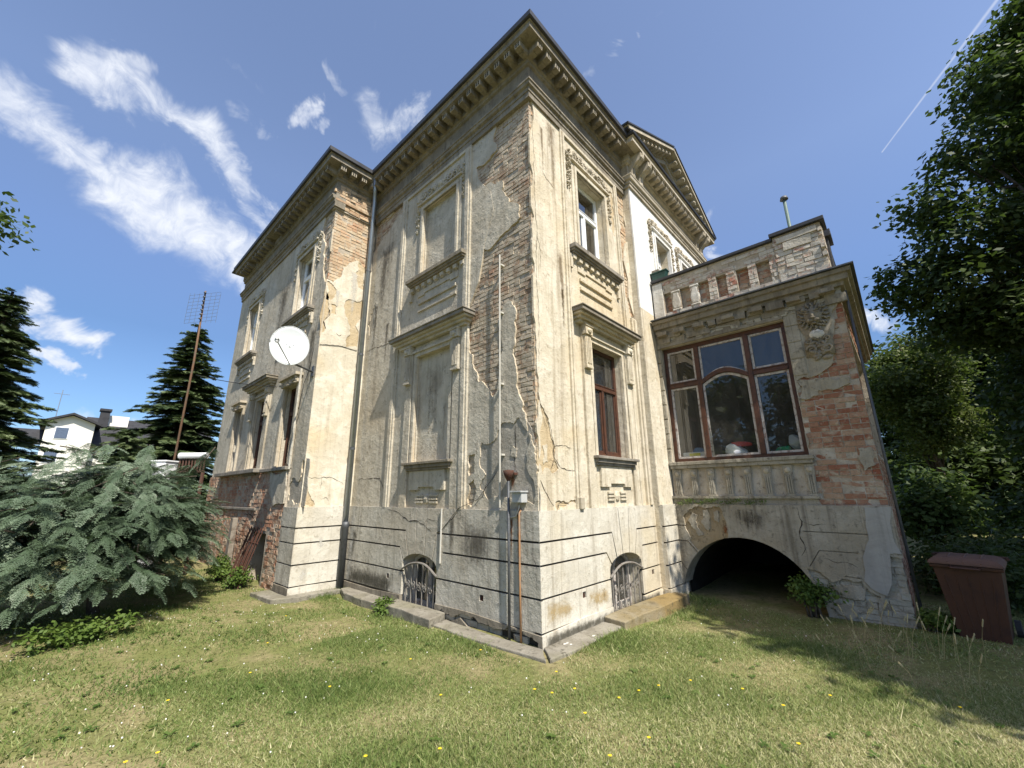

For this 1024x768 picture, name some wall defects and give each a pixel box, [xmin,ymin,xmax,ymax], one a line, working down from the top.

flaking render [319,185,403,347]
flaking render [469,101,558,511]
flaking render [798,287,889,506]
crack [539,397,571,509]
leakage [349,571,390,590]
flaking render [683,503,728,553]
flaking render [809,557,918,629]